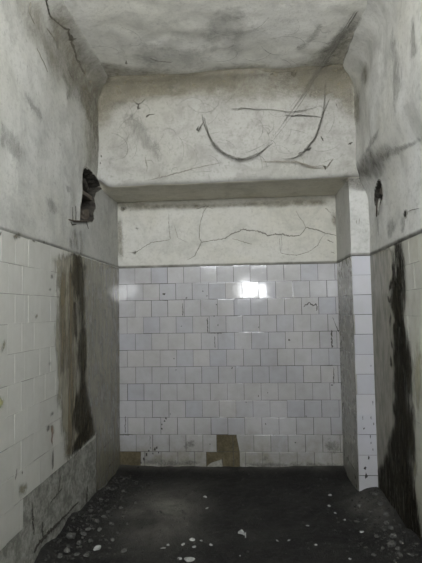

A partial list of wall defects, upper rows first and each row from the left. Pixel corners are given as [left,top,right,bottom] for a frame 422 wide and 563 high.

crack [29,0,84,79]
spalling [69,166,101,229]
spalling [374,179,384,217]
crack [188,206,336,260]
leakage [55,233,120,491]
leakage [370,242,422,542]
peeling [120,452,141,466]
peeling [206,435,240,467]
peeling [0,436,98,563]